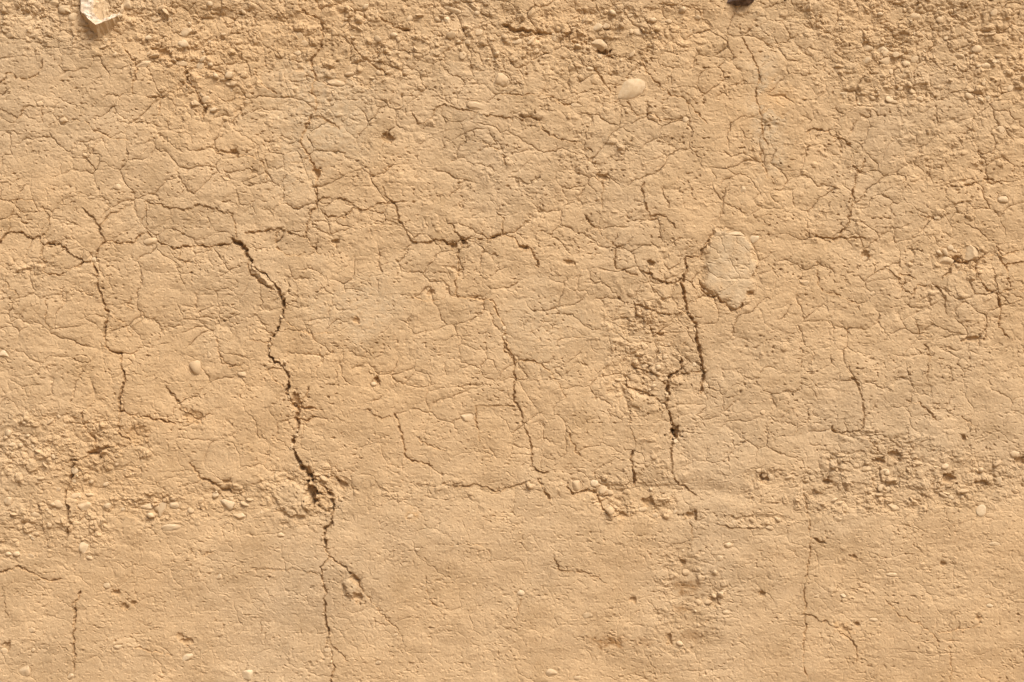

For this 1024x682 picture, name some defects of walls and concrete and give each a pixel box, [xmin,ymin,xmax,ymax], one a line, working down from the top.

crack [806,128,867,310]
crack [950,178,1003,188]
crack [0,0,610,682]
crack [585,175,744,497]
crack [884,240,1024,433]